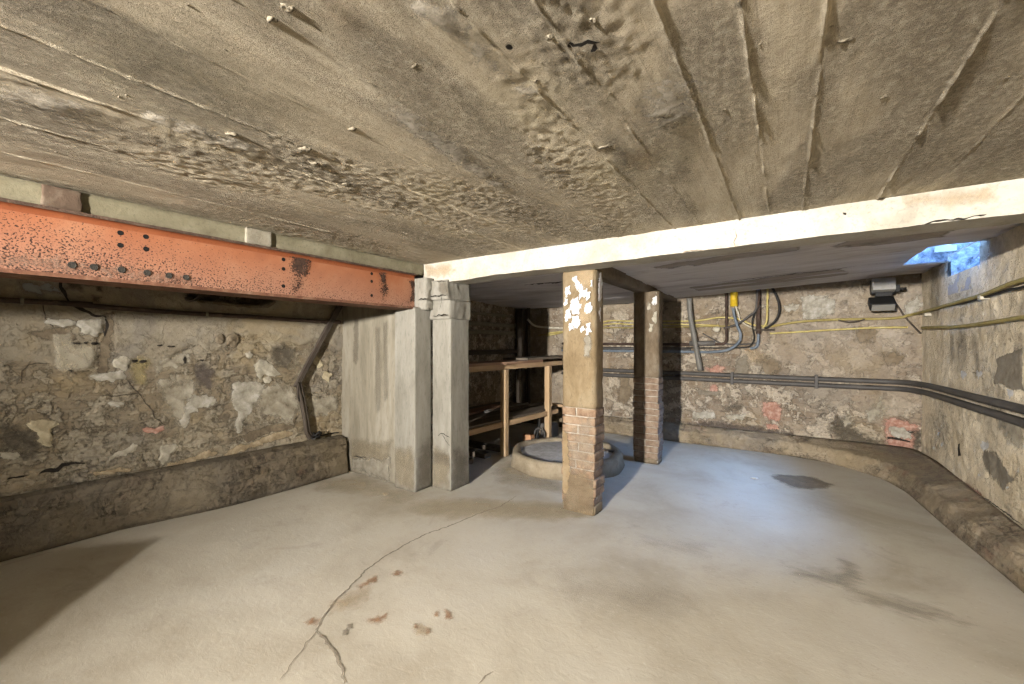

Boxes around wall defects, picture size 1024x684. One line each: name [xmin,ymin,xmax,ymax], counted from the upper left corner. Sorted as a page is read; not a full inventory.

corrosion [289,256,311,295]
peeling [563,273,603,335]
peeling [647,292,657,332]
flaking render [30,313,127,382]
flaking render [154,345,203,372]
flaking render [245,351,281,384]
flaking render [26,419,59,447]
flaking render [107,443,138,461]
flaking render [142,426,178,465]
flaking render [883,418,921,450]
damp [773,475,831,489]
crack [281,496,516,683]